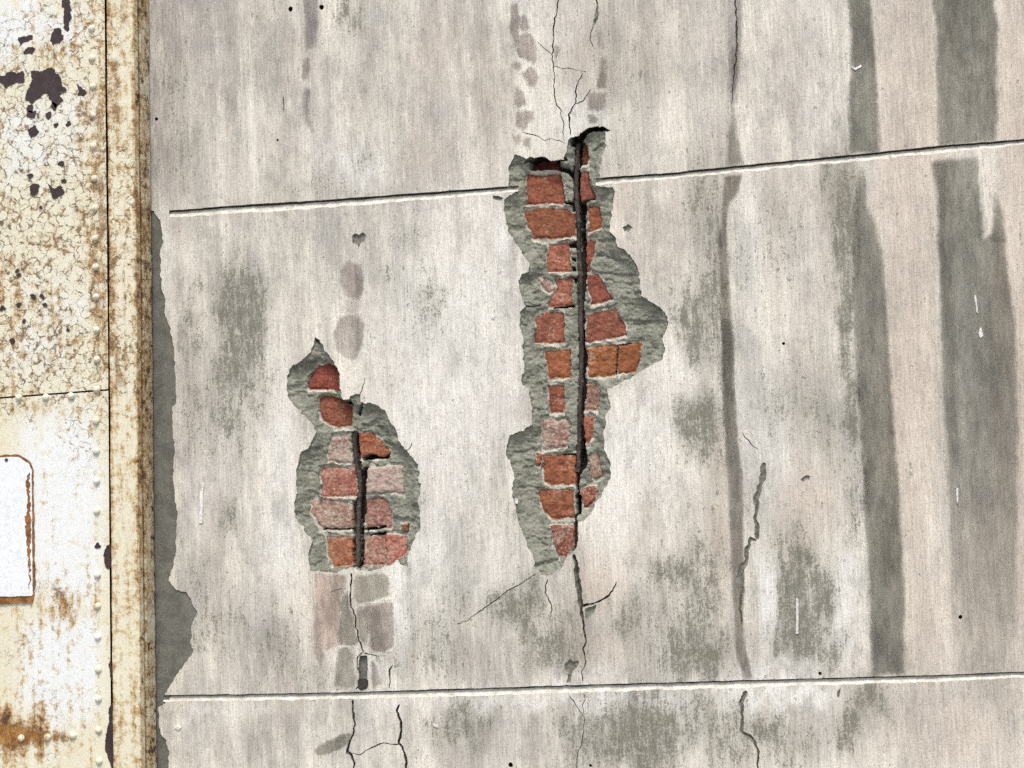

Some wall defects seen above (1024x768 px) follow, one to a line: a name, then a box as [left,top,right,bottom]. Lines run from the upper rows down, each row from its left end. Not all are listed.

peeling [0,67,87,137]
rust [96,62,119,143]
damp [934,0,997,144]
flaking render [151,211,197,768]
flaking render [287,337,421,573]
flaking render [493,127,668,576]
crack [736,432,767,625]
damp [854,184,904,673]
damp [933,158,1015,437]
rust [0,724,72,747]
crack [330,573,408,768]
crack [569,554,617,768]